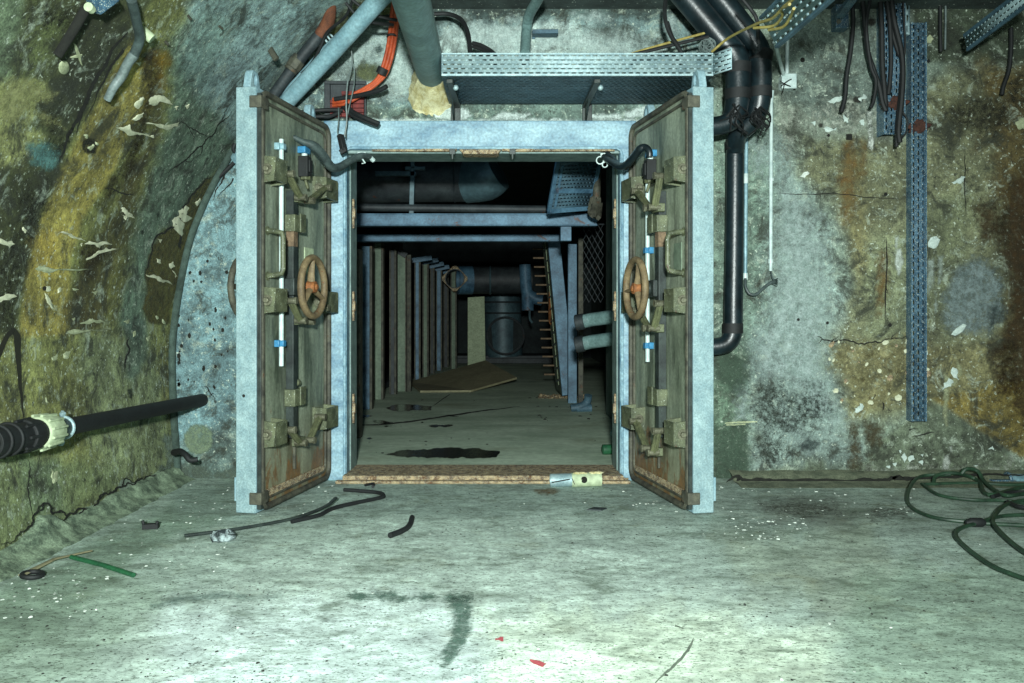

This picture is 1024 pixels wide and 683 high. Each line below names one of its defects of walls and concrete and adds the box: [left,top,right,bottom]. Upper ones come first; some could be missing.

crack [168,109,232,173]
crack [782,190,904,200]
flaking render [141,176,213,365]
crack [818,238,906,345]
crack [1,460,165,544]